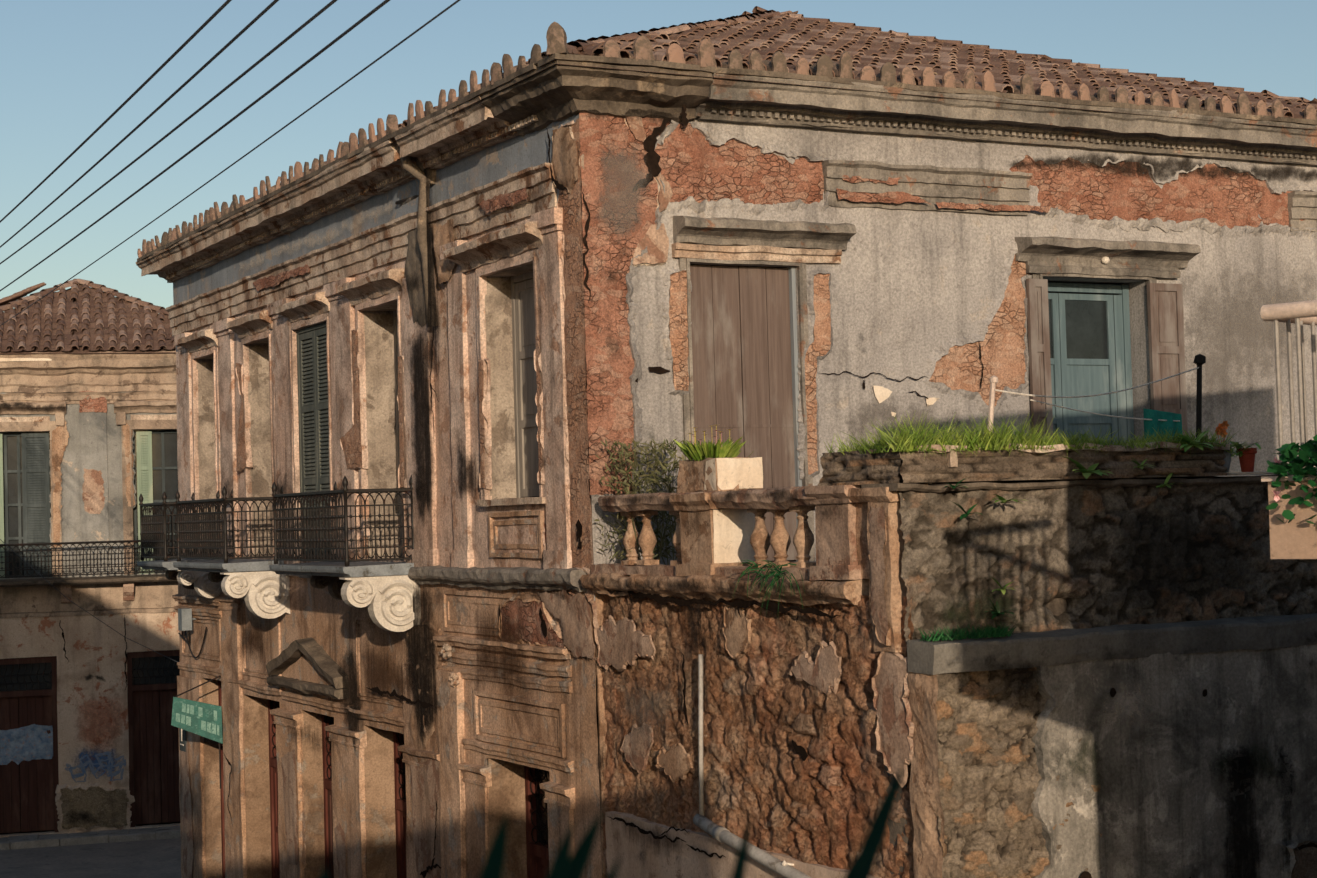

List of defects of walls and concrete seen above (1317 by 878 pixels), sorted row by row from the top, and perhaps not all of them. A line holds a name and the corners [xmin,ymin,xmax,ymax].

crack [546,128,591,302]
flaking render [1003,149,1317,239]
flaking render [481,60,834,574]
flaking render [923,241,1032,417]
crack [819,371,928,399]
flaking render [499,590,656,672]
spalling [722,605,752,659]
flaking render [55,783,135,832]
crack [607,816,725,859]
water stain [1211,747,1295,878]
flaking render [1280,832,1317,878]